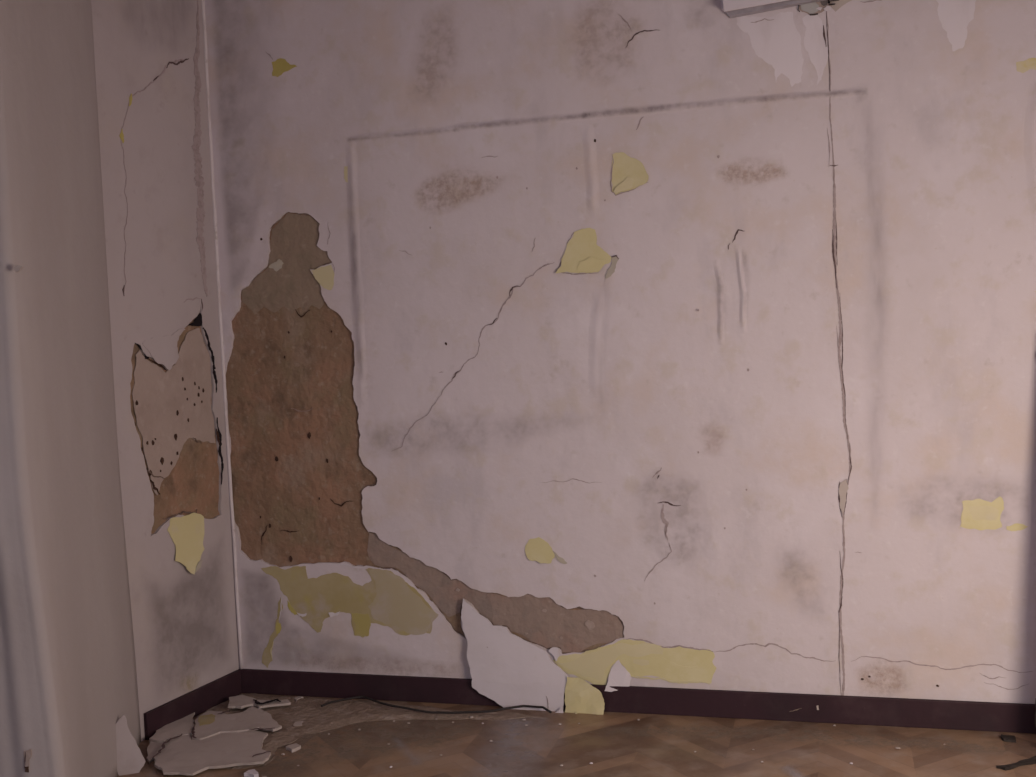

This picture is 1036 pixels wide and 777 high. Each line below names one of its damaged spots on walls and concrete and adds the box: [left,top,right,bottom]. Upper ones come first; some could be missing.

peeling [265,51,297,77]
flaking render [797,0,839,15]
crack [184,0,208,309]
peeling [610,152,649,196]
crack [393,239,553,451]
crack [716,11,1032,696]
flaking render [130,212,716,715]
crack [644,467,680,581]
peeling [960,497,1028,531]